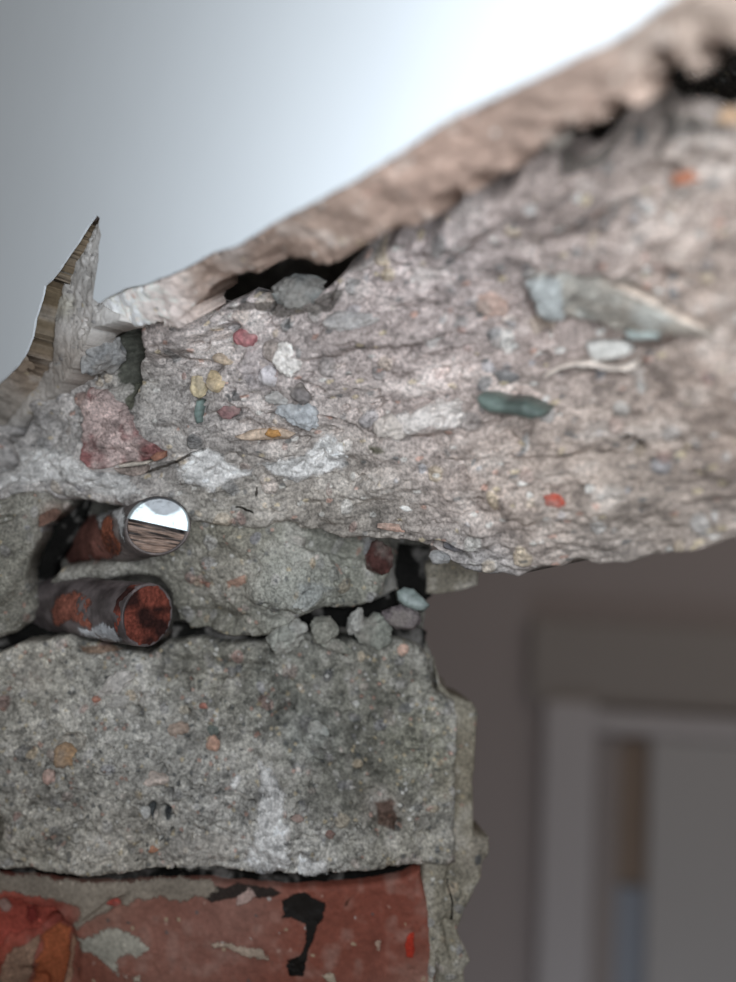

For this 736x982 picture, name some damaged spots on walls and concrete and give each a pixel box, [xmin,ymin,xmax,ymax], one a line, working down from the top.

spalling [667,45,736,105]
spalling [560,104,630,176]
spalling [663,114,726,138]
spalling [224,243,367,317]
flaking render [6,222,148,428]
peeling [525,270,715,378]
corrosion [38,508,61,527]
corrosion [65,514,122,564]
corrosion [52,590,92,630]
corrosion [81,584,171,654]
crack [0,863,413,883]
spalling [0,897,76,982]